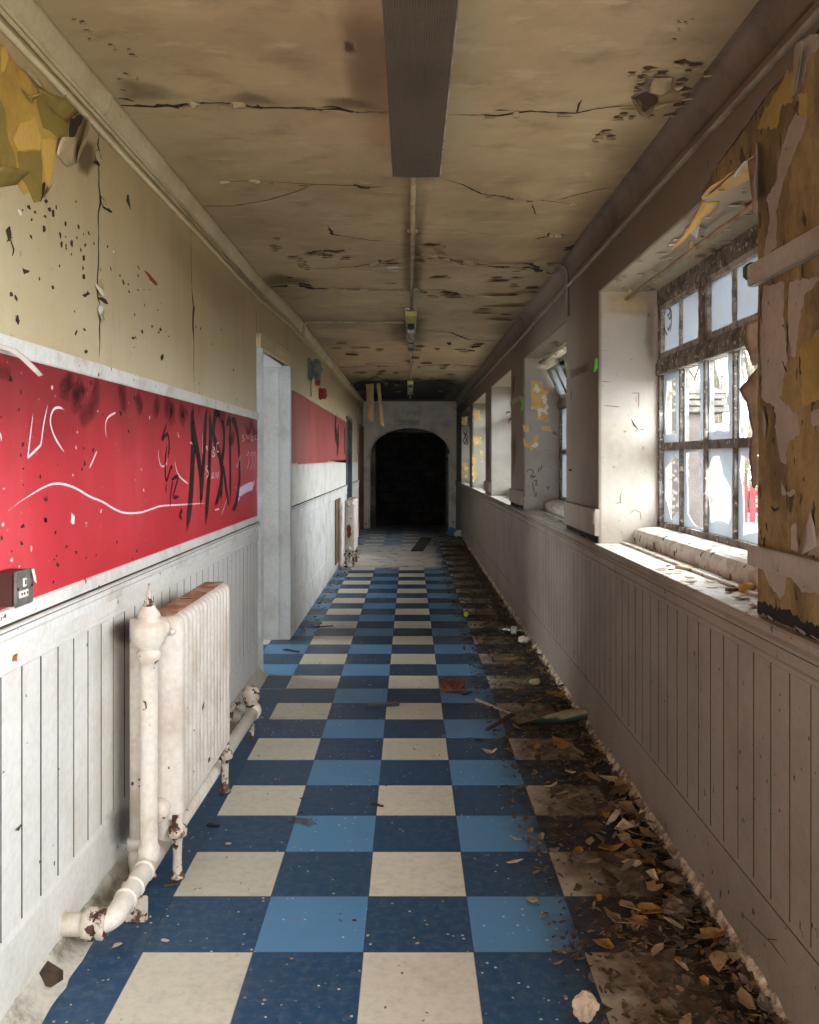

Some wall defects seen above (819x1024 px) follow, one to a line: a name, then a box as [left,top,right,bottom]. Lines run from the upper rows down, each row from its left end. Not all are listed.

crack [119,98,383,115]
crack [472,99,636,119]
flaking render [592,58,713,143]
peeling [0,43,150,322]
crack [69,115,112,354]
crack [203,179,389,207]
crack [270,179,609,298]
peeling [616,34,819,292]
crack [189,269,197,342]
peeling [522,380,557,451]
peeling [739,255,819,560]
peeling [655,565,819,640]